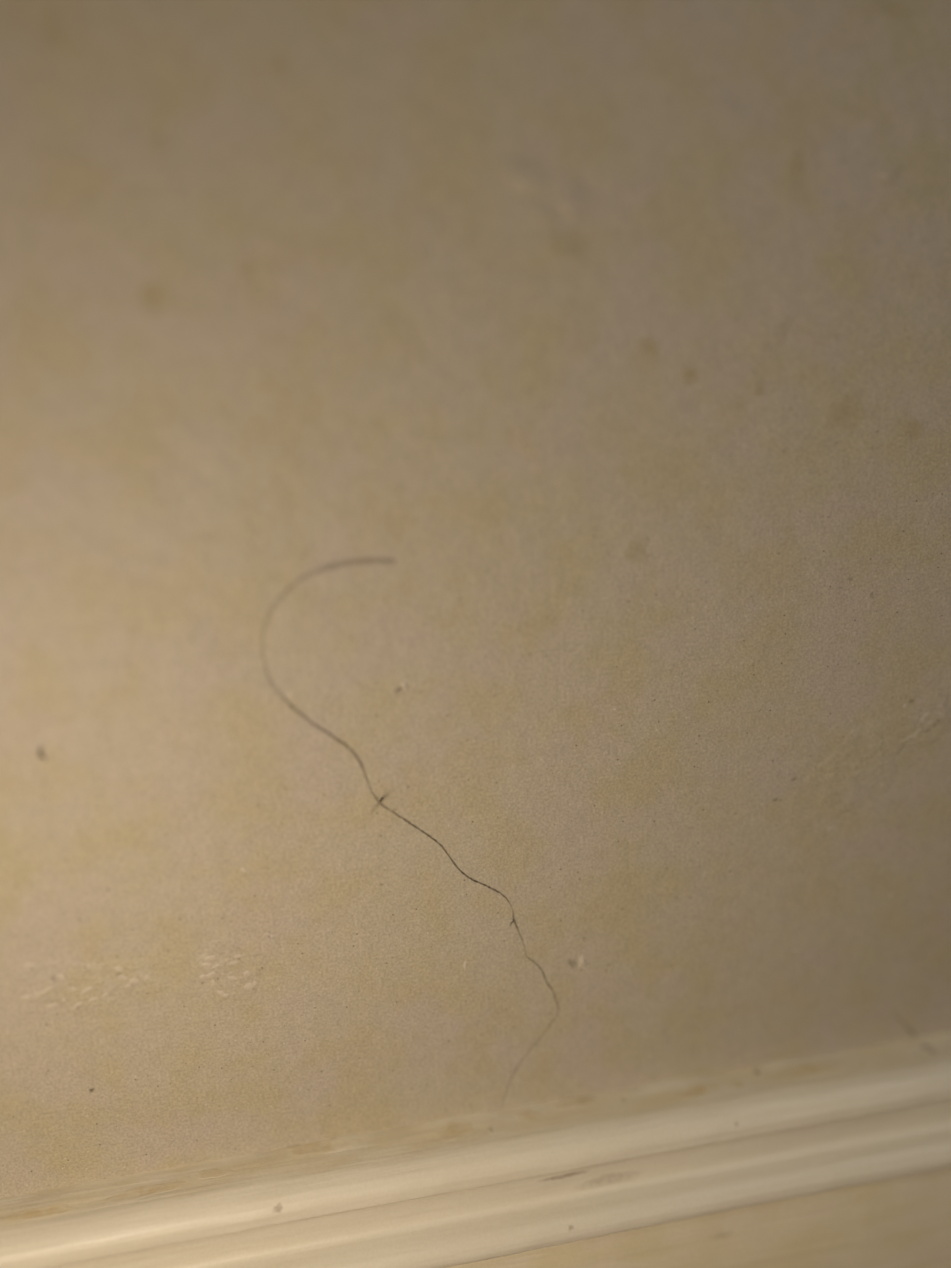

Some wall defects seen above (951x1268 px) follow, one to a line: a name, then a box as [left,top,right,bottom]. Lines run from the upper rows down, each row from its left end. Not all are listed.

crack [259,557,559,1110]